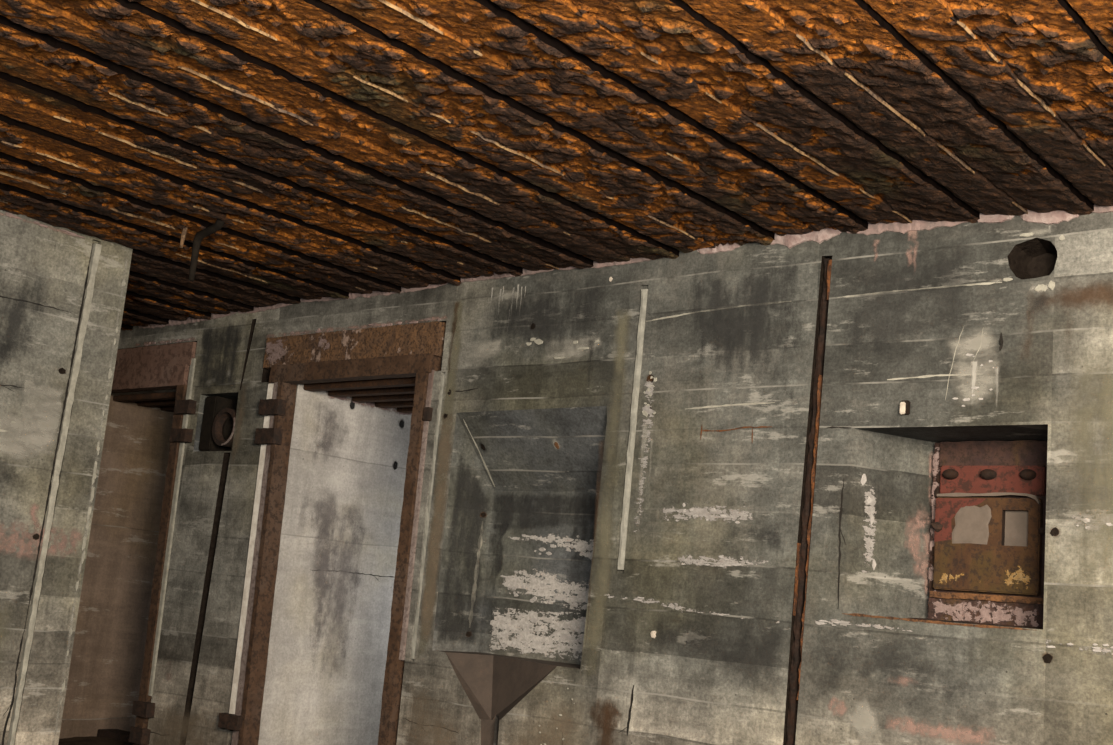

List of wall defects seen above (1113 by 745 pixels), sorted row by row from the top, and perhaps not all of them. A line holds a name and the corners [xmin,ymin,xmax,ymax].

corrosion [1060,285,1113,305]
damp [318,527,356,629]
peeling [490,569,590,661]
peeling [510,534,594,560]
corrosion [793,374,823,700]
corrosion [591,702,620,745]